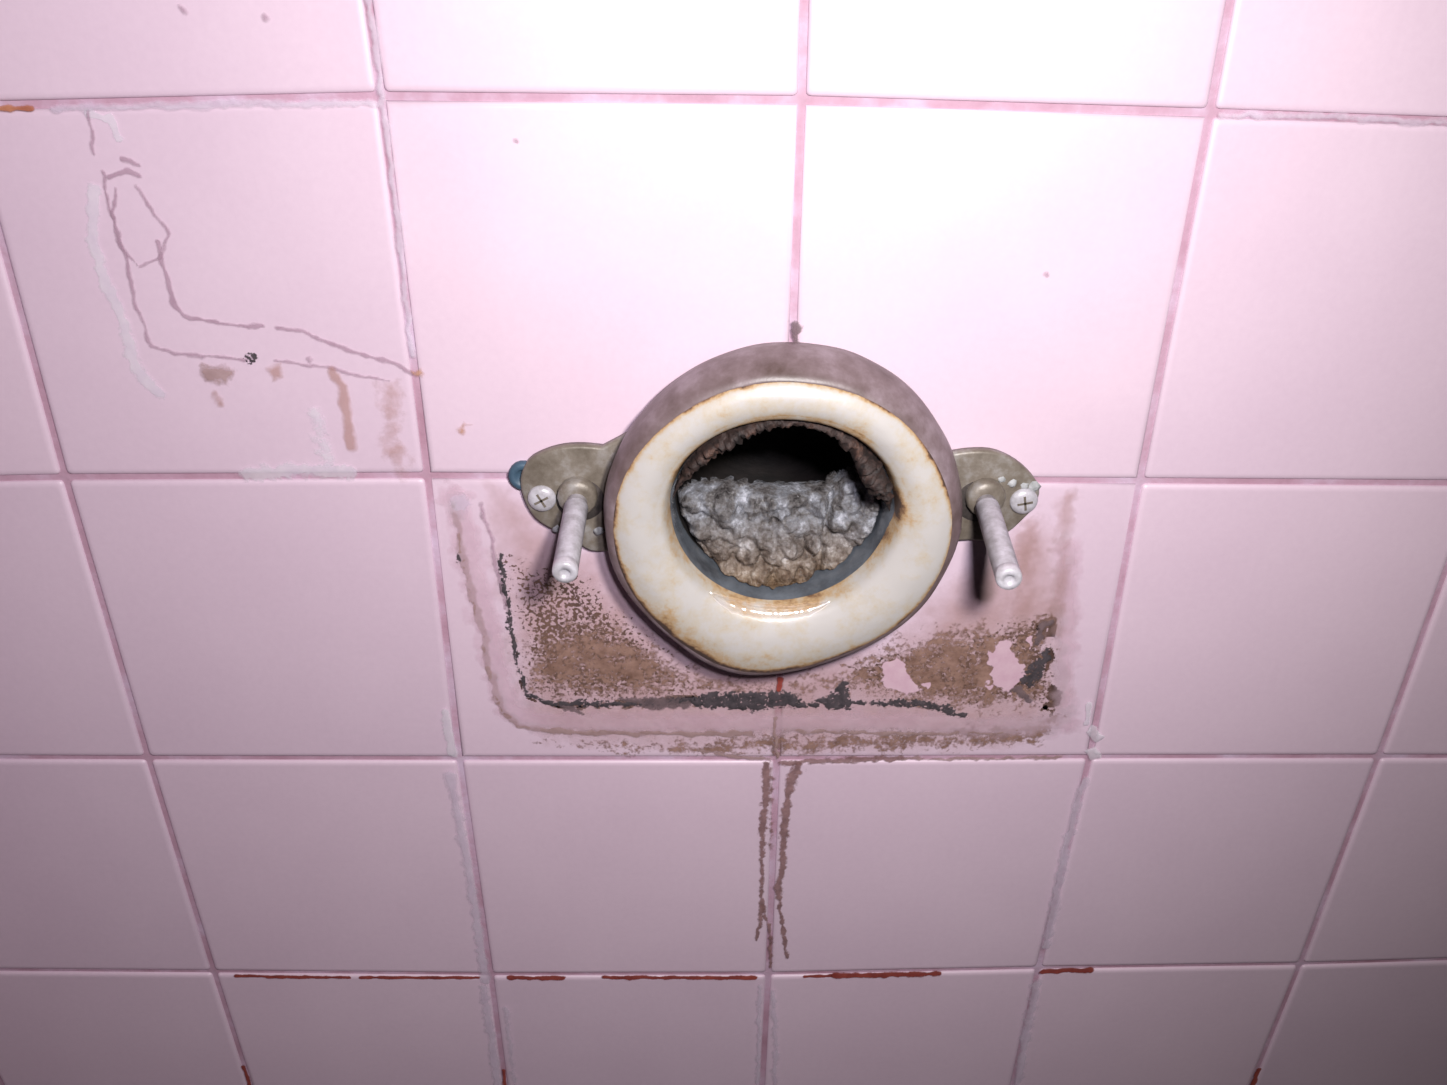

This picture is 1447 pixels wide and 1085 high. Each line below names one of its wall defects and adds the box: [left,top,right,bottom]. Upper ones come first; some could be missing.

damp [498,553,968,718]
peeling [881,658,931,695]
peeling [985,636,1033,695]
damp [1009,619,1054,703]
damp [698,750,1062,766]
crack [755,677,802,968]
rust [803,971,941,979]